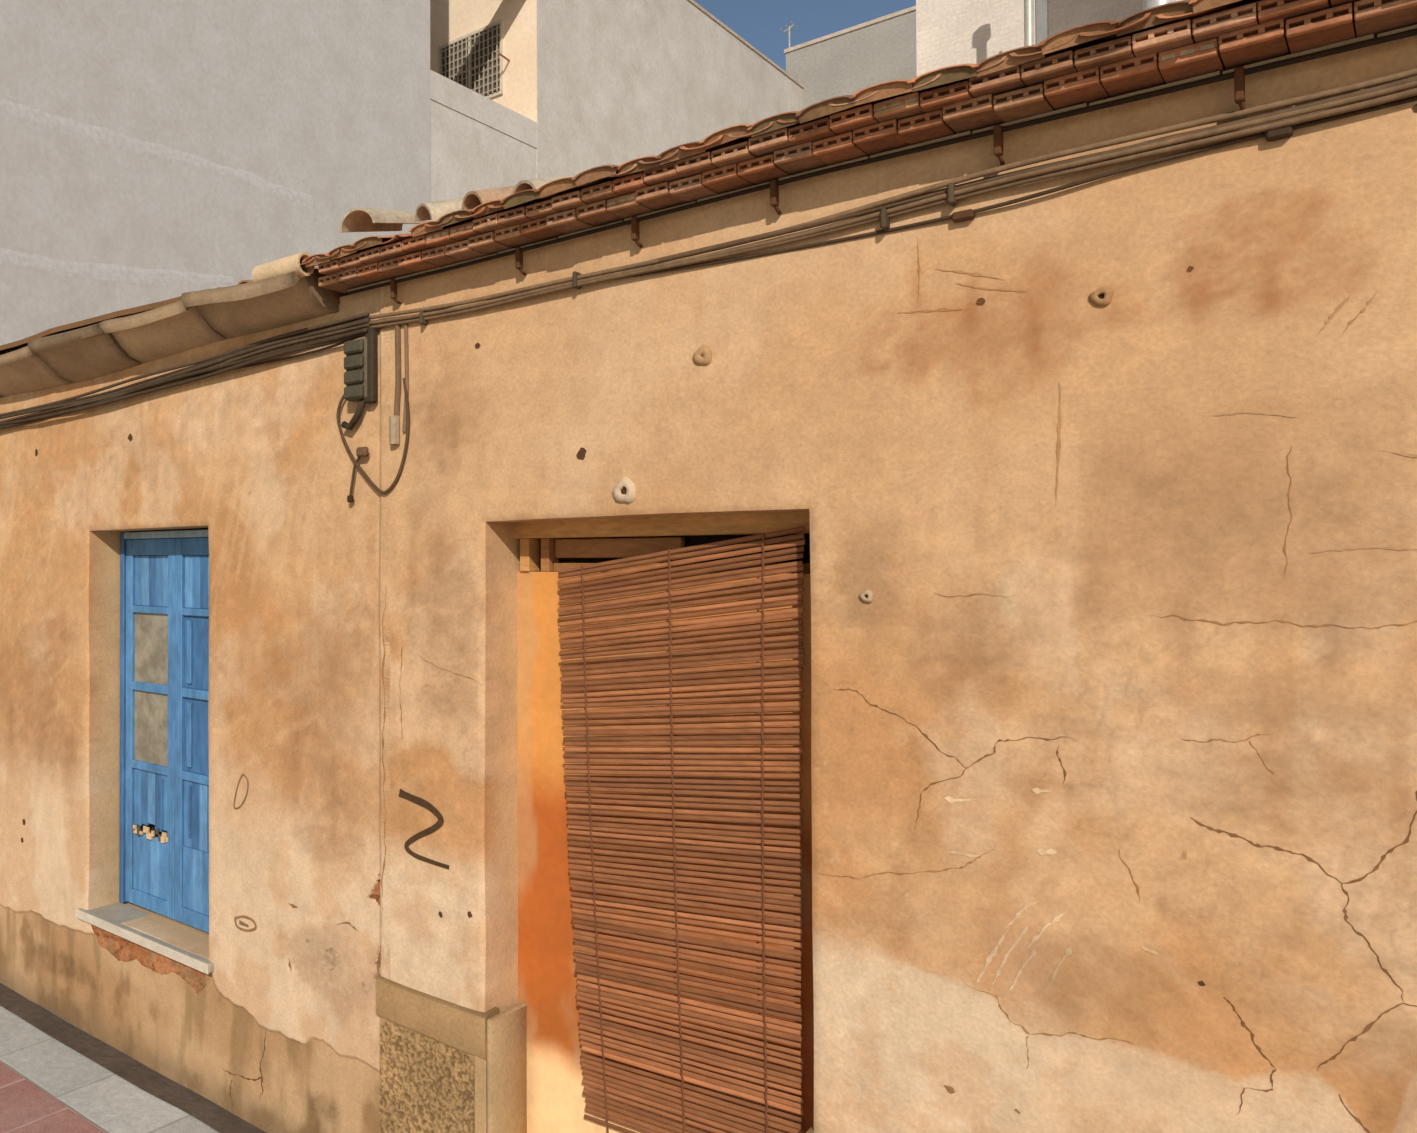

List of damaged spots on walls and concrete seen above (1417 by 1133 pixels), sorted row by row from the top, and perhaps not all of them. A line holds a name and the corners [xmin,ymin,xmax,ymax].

crack [1283,447,1292,577]
crack [935,591,1014,599]
crack [1157,614,1417,629]
crack [1183,733,1275,775]
crack [1119,850,1140,902]
flaking render [91,924,207,994]
crack [1190,791,1417,1133]
crack [970,986,1132,1068]